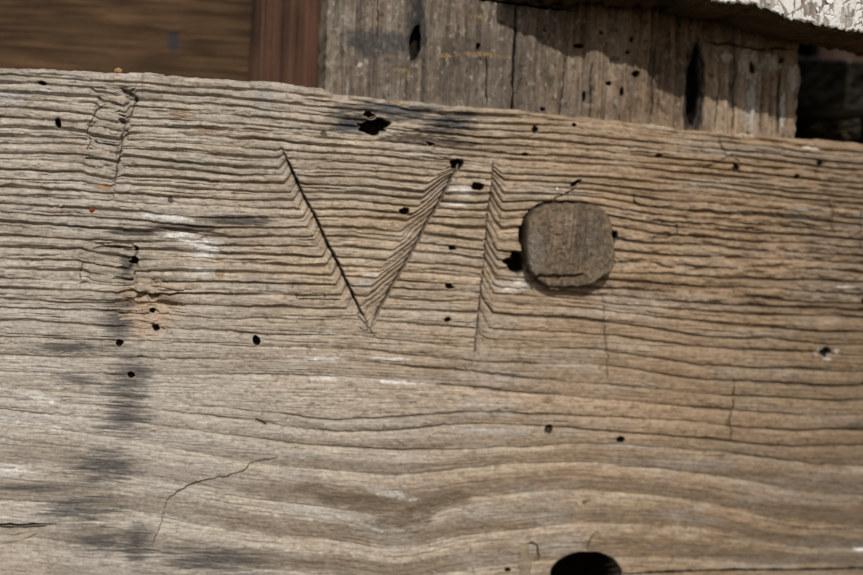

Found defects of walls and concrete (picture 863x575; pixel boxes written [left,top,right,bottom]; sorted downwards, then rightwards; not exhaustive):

peeling [800,0,834,18]
crack [476,0,575,115]
crack [703,40,795,169]
crack [600,293,610,379]
crack [725,379,736,441]
crack [151,457,278,550]